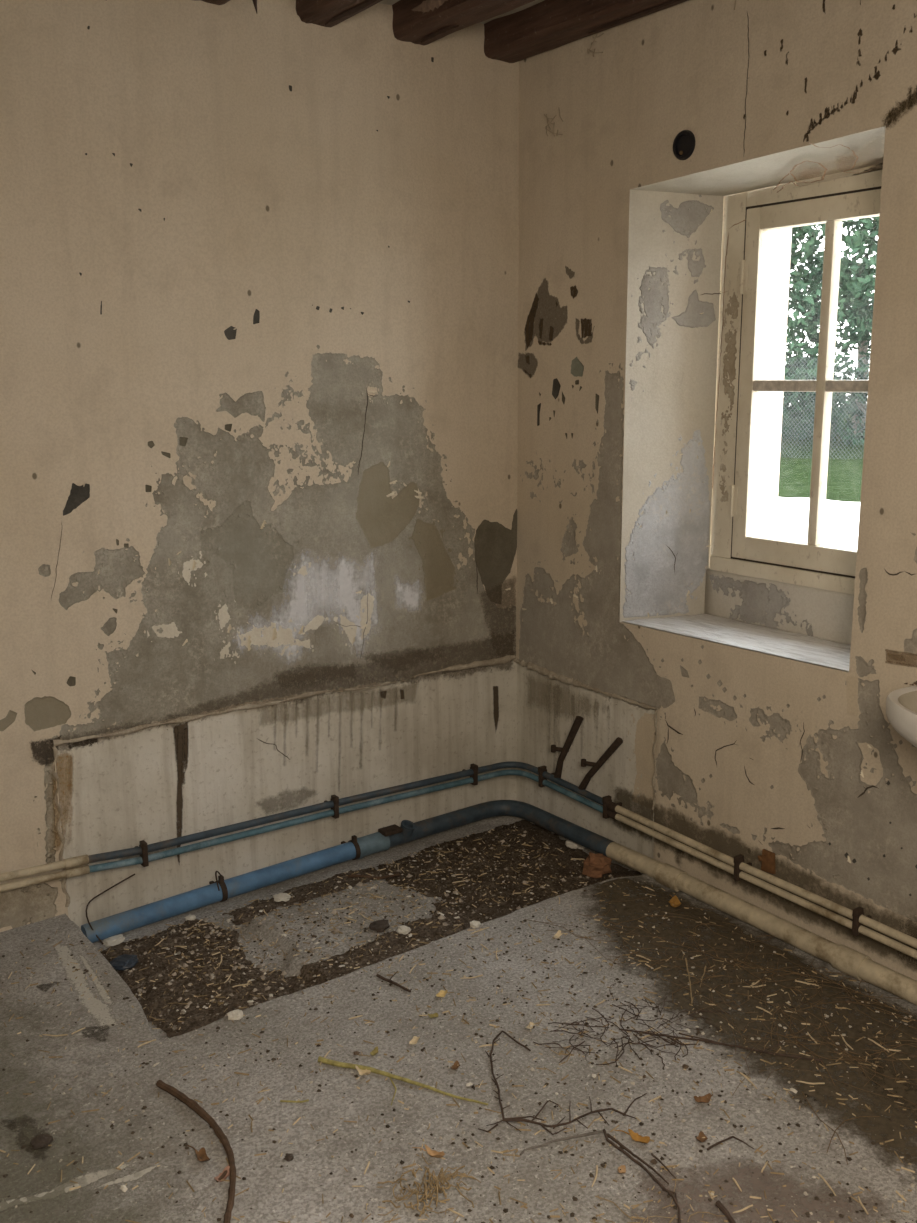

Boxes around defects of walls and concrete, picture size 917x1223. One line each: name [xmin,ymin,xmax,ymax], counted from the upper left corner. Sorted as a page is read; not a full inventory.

water stain [773,13,917,192]
water stain [30,555,516,863]
peeling [0,195,917,929]
water stain [614,789,917,970]